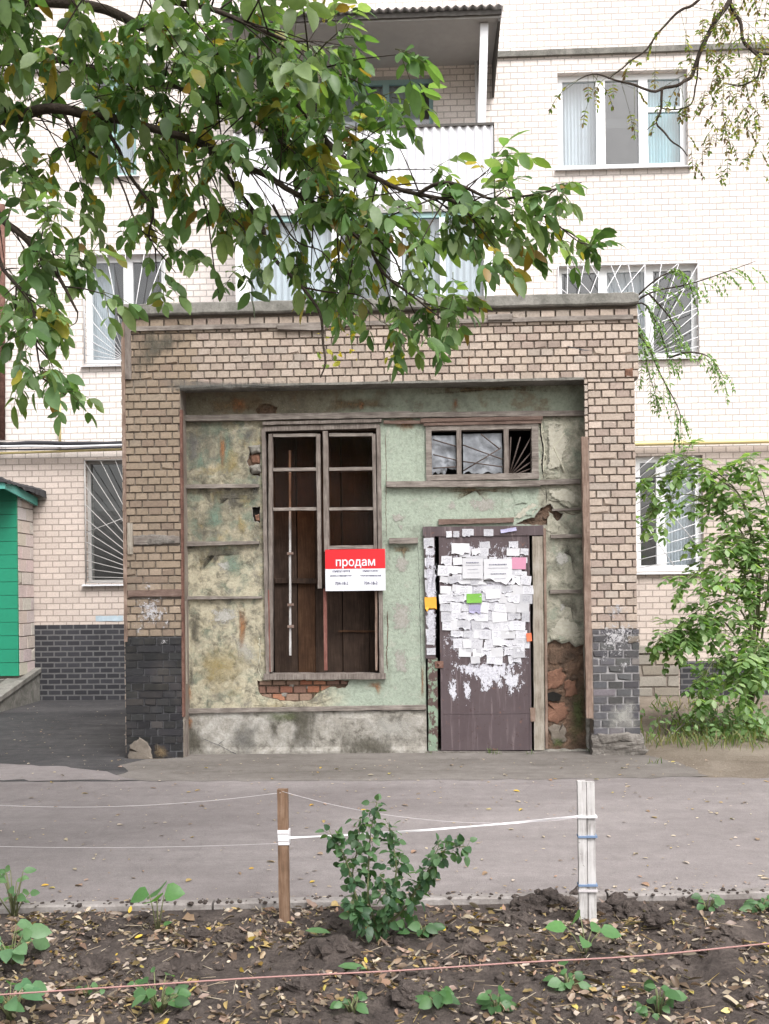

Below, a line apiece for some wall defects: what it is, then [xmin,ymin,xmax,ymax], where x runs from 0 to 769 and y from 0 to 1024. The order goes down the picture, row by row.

spalling [246,444,261,476]
peeling [547,423,568,473]
spalling [252,506,260,523]
peeling [511,487,579,533]
spalling [255,679,350,707]
spalling [547,616,641,750]
water stain [295,711,314,743]
water stain [351,723,397,753]